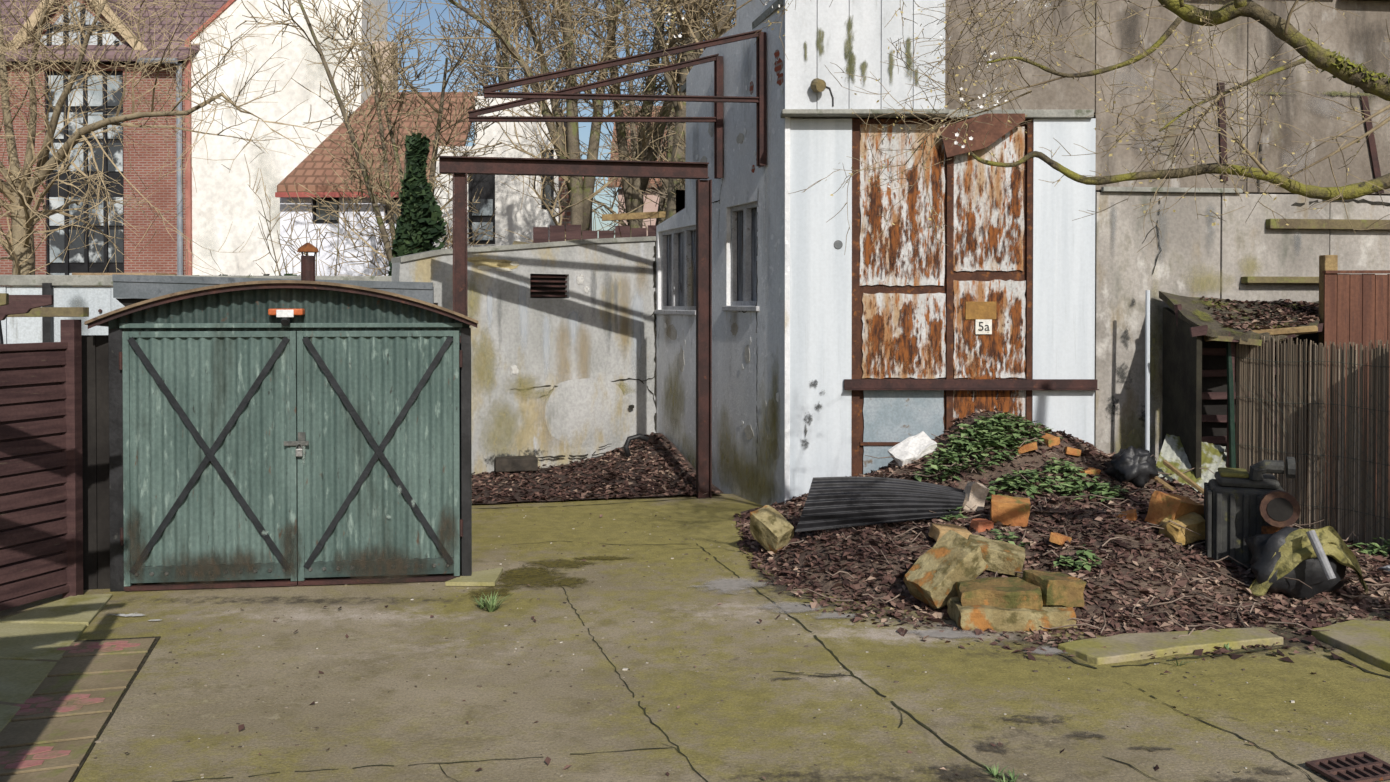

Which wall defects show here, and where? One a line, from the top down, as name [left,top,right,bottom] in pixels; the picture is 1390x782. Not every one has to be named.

leakage [804,28,824,59]
leakage [845,53,868,82]
leakage [888,38,918,85]
rust [863,114,1025,282]
rust [864,288,1023,419]